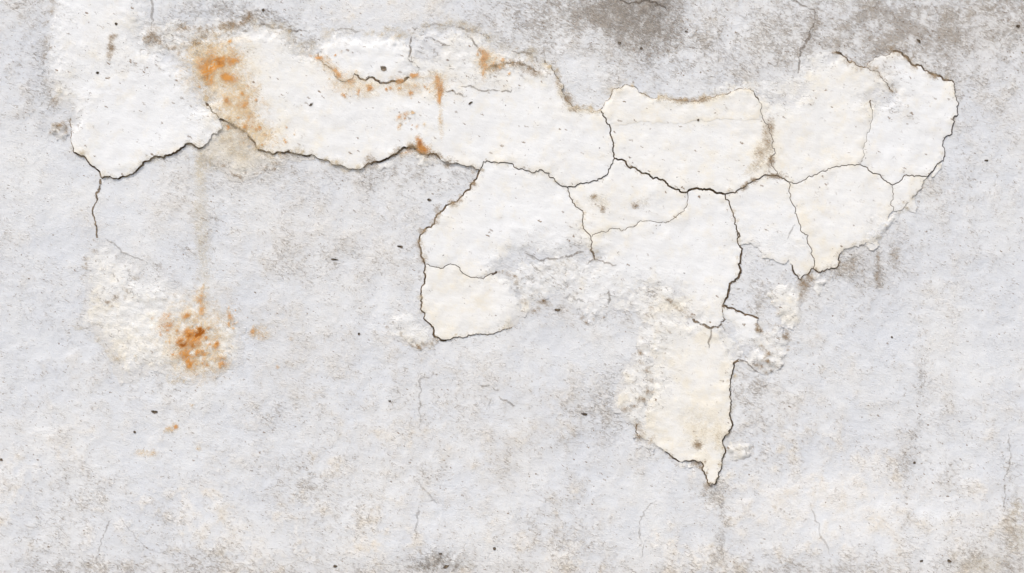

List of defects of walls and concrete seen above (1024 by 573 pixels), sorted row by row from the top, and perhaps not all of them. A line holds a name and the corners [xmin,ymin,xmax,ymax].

crack [54,98,203,238]
rust [190,40,286,146]
crack [203,96,451,170]
rust [315,54,372,97]
crack [318,53,409,84]
rust [385,74,443,104]
flaking render [43,0,958,485]
crack [417,48,959,342]
rust [160,295,236,371]
crack [635,359,739,486]